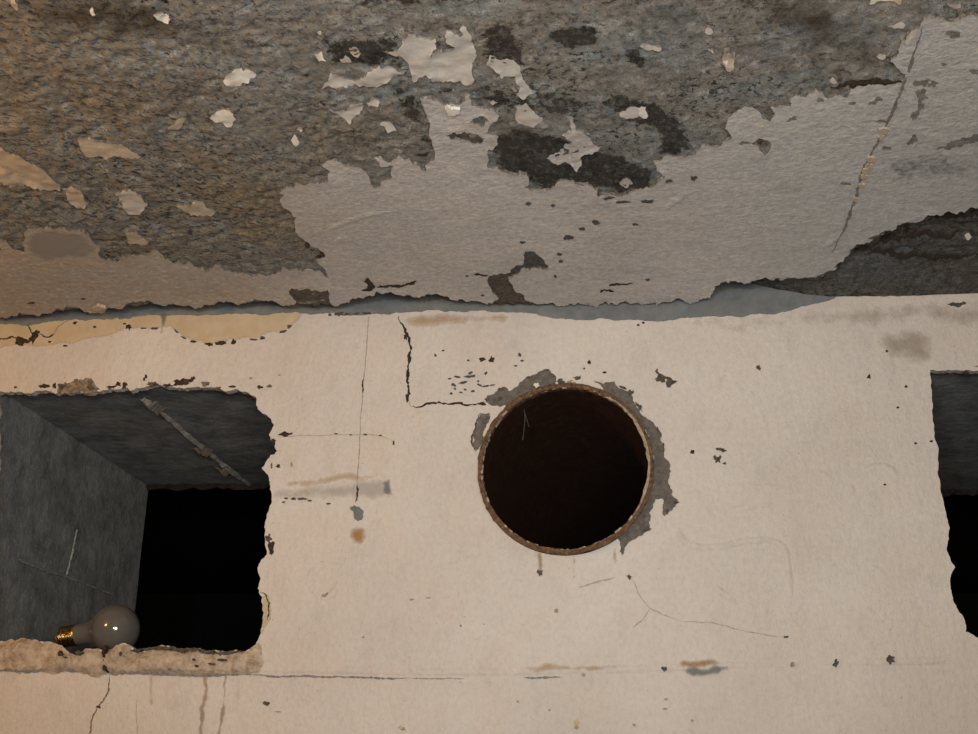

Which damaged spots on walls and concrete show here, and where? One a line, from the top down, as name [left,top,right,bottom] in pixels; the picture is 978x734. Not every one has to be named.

peeling [0,1,978,348]
crack [830,27,922,252]
crack [362,278,417,292]
crack [288,316,395,521]
crack [398,316,486,408]
peeling [448,356,591,450]
peeling [595,369,680,555]
spalling [0,592,271,678]
crack [89,677,110,734]